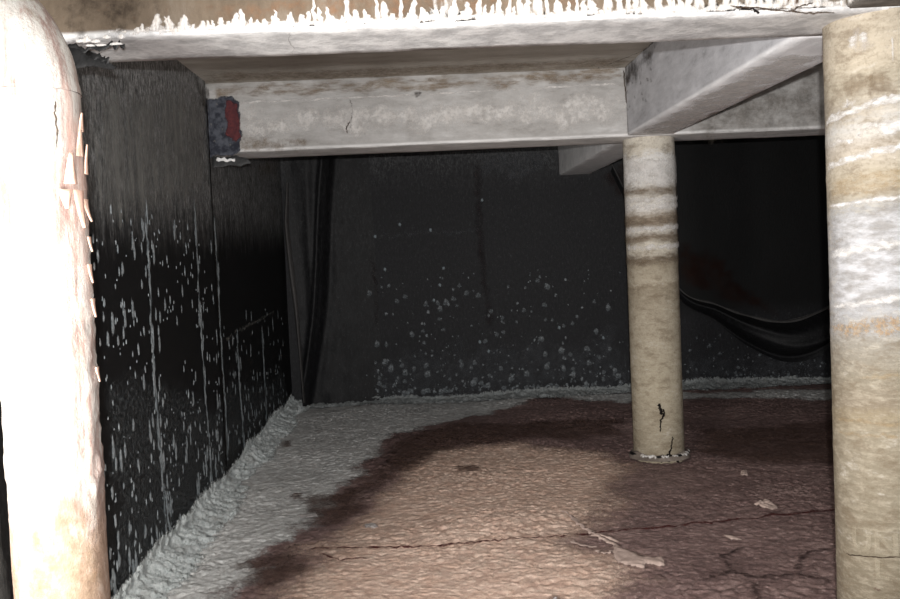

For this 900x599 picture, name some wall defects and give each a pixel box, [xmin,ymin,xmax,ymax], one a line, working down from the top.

damp [122,0,853,33]
damp [247,61,615,137]
peeling [57,113,93,252]
damp [95,92,638,599]
crack [657,404,679,463]
damp [701,422,833,462]
crack [298,509,835,561]